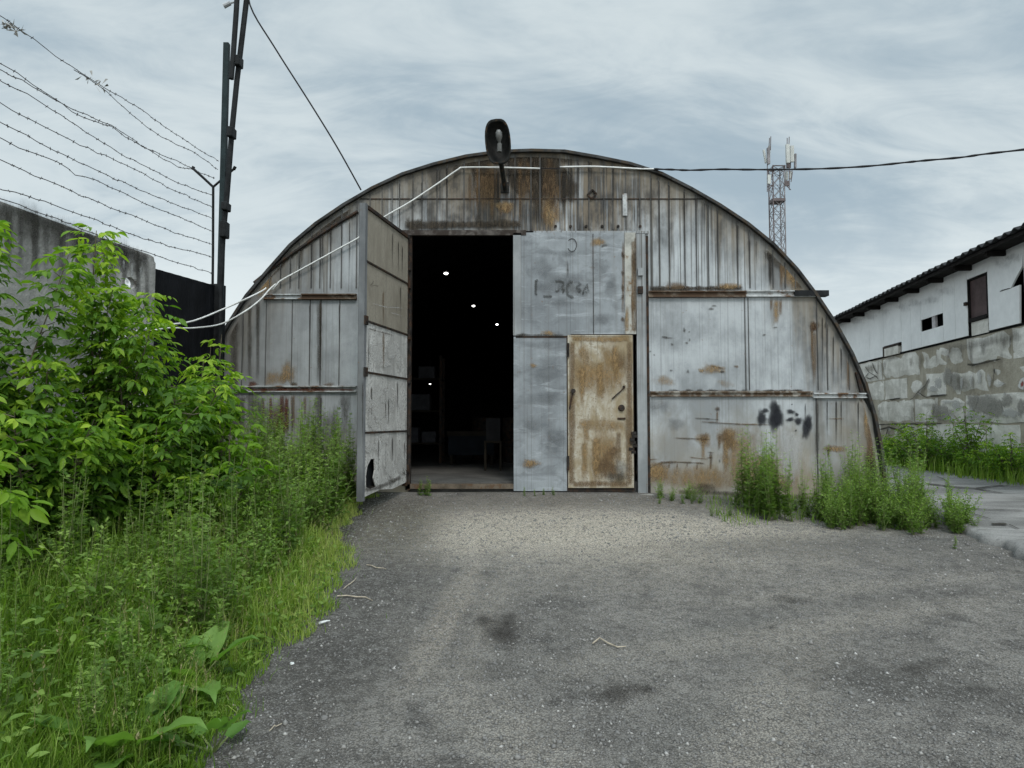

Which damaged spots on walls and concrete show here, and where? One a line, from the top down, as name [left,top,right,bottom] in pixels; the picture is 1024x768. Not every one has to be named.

corrosion [469,157,577,225]
corrosion [248,363,352,436]
peeling [365,383,406,477]
corrosion [522,238,636,486]
corrosion [650,407,771,490]